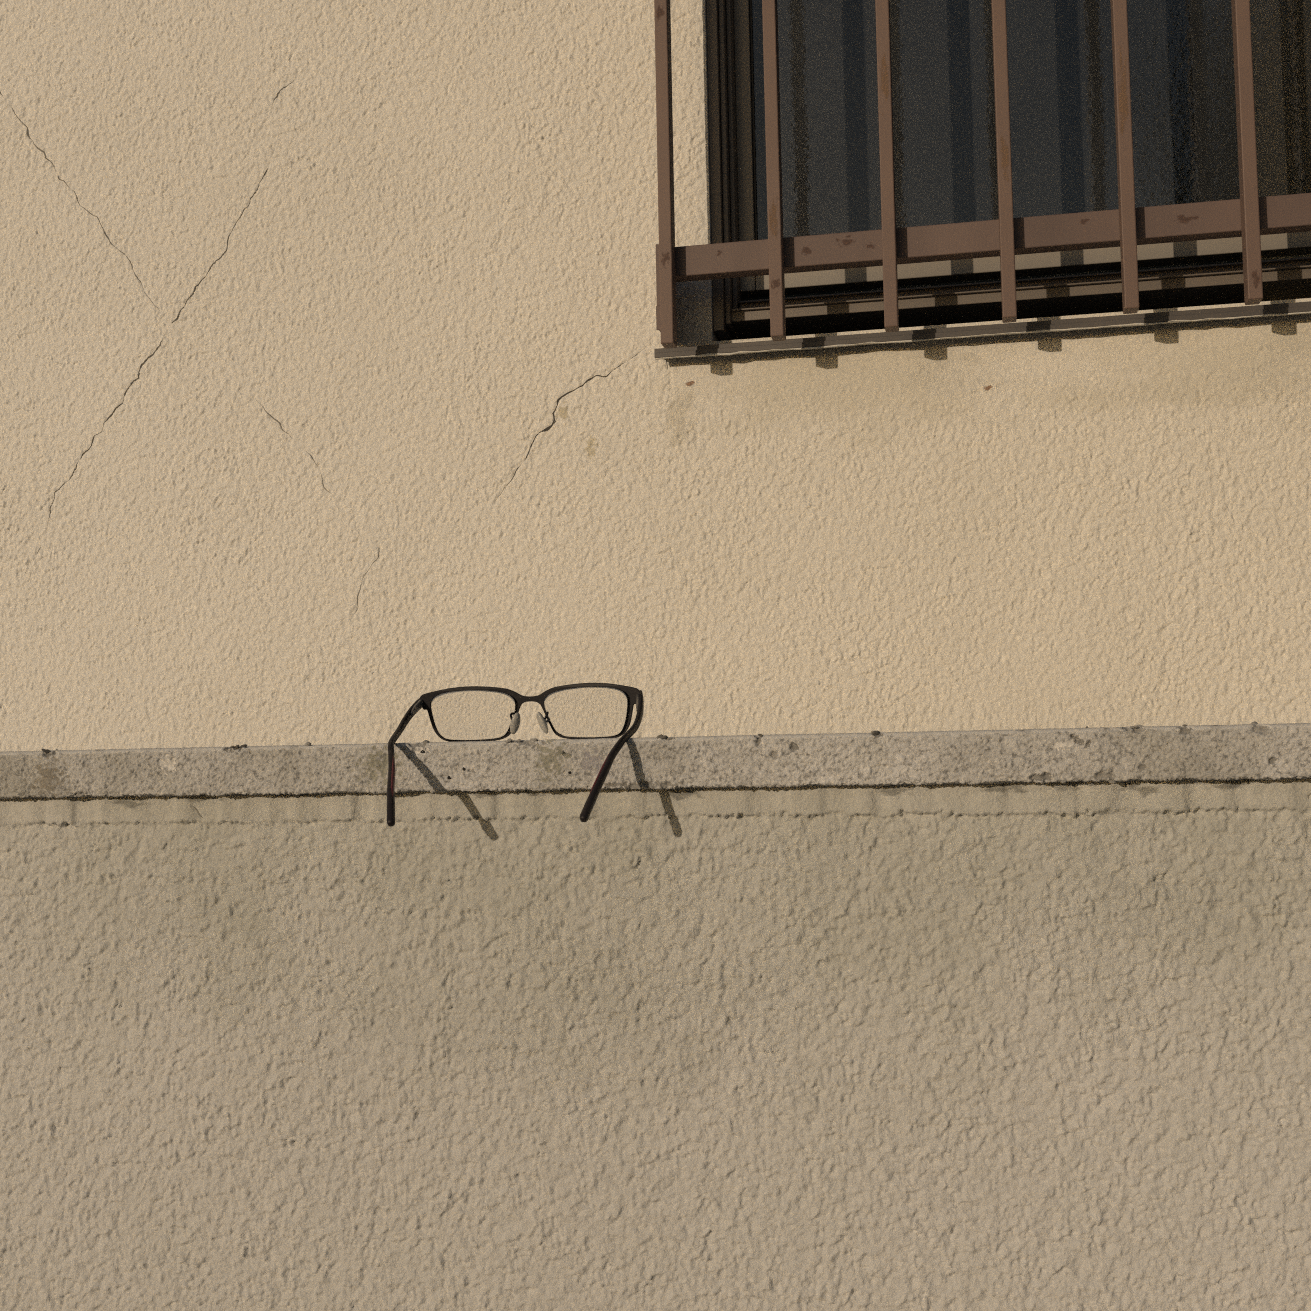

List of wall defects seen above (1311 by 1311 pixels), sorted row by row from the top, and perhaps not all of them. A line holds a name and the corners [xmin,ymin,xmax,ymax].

crack [0,93,272,569]
crack [499,350,667,496]